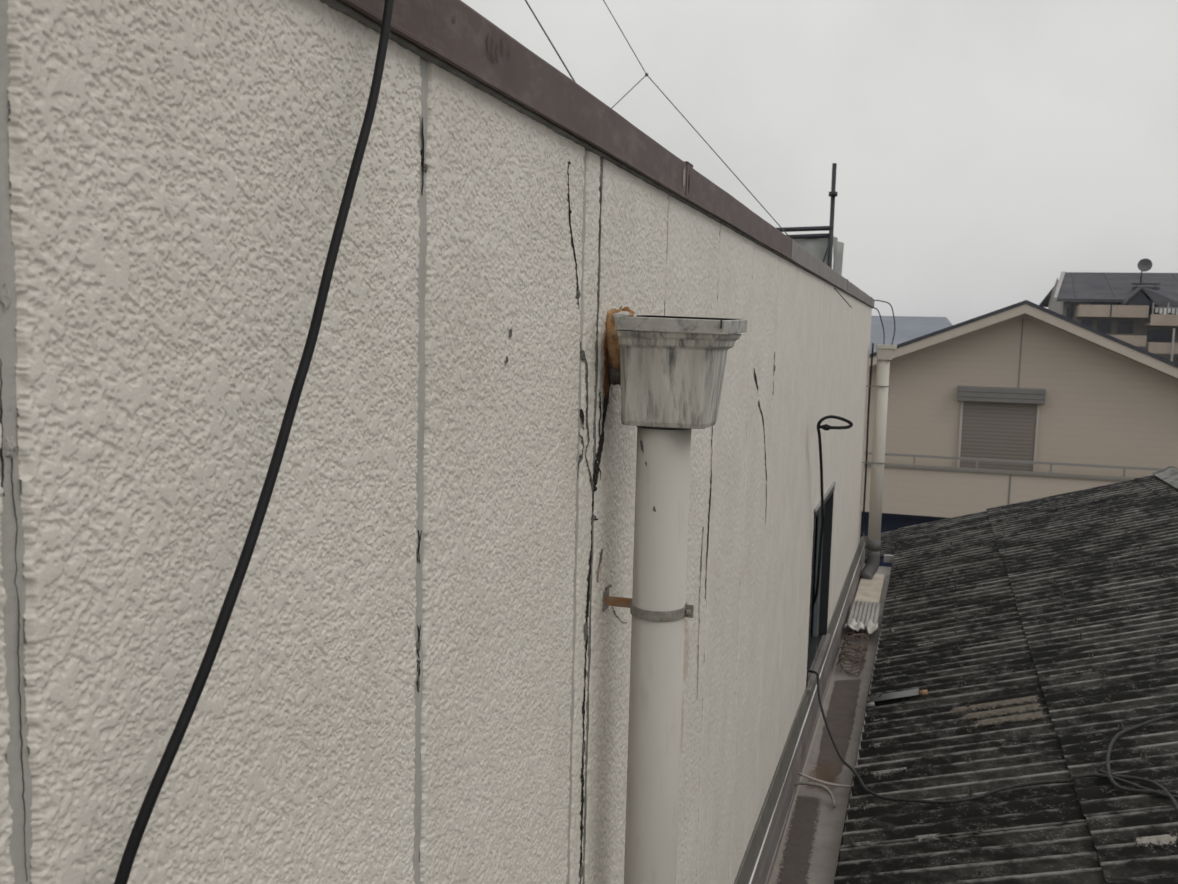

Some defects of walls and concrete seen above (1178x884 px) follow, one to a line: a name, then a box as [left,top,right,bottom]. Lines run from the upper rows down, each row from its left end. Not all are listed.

crack [0,359,28,882]
crack [568,162,626,884]
crack [754,368,767,506]